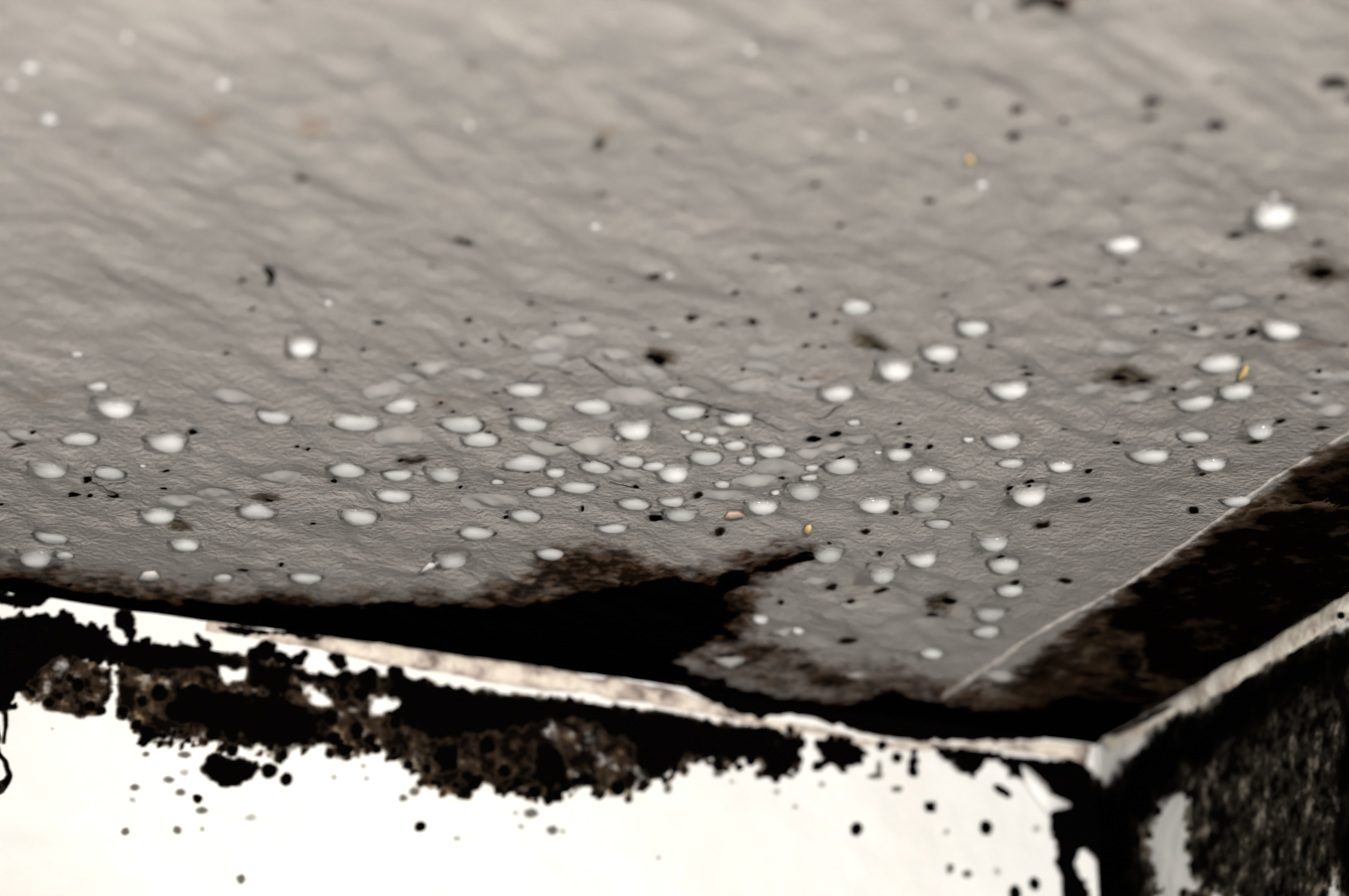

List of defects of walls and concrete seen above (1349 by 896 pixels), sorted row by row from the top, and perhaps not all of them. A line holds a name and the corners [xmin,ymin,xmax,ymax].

water stain [0,425,1349,896]